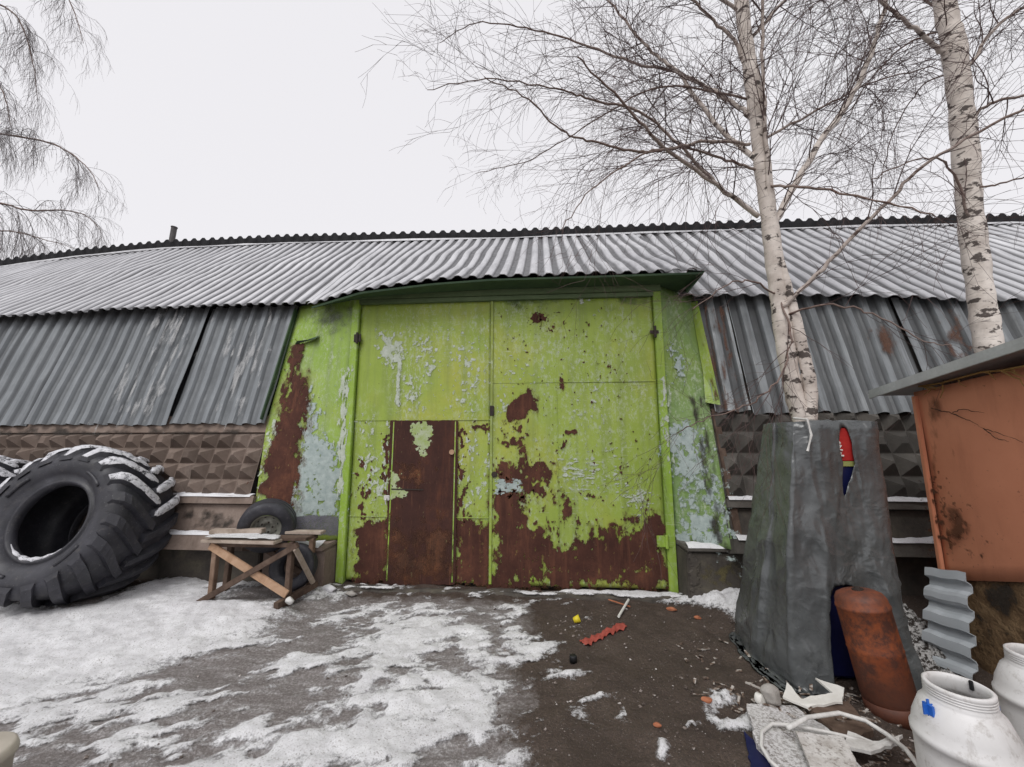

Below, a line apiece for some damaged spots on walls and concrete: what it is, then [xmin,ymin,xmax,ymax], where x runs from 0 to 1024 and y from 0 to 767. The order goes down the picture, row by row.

rust [247,339,311,506]
peeling [290,326,560,535]
rust [350,359,677,592]
rust [504,302,631,408]
peeling [553,379,654,518]
peeling [658,341,738,563]
rust [920,471,971,554]
crack [931,408,1023,443]